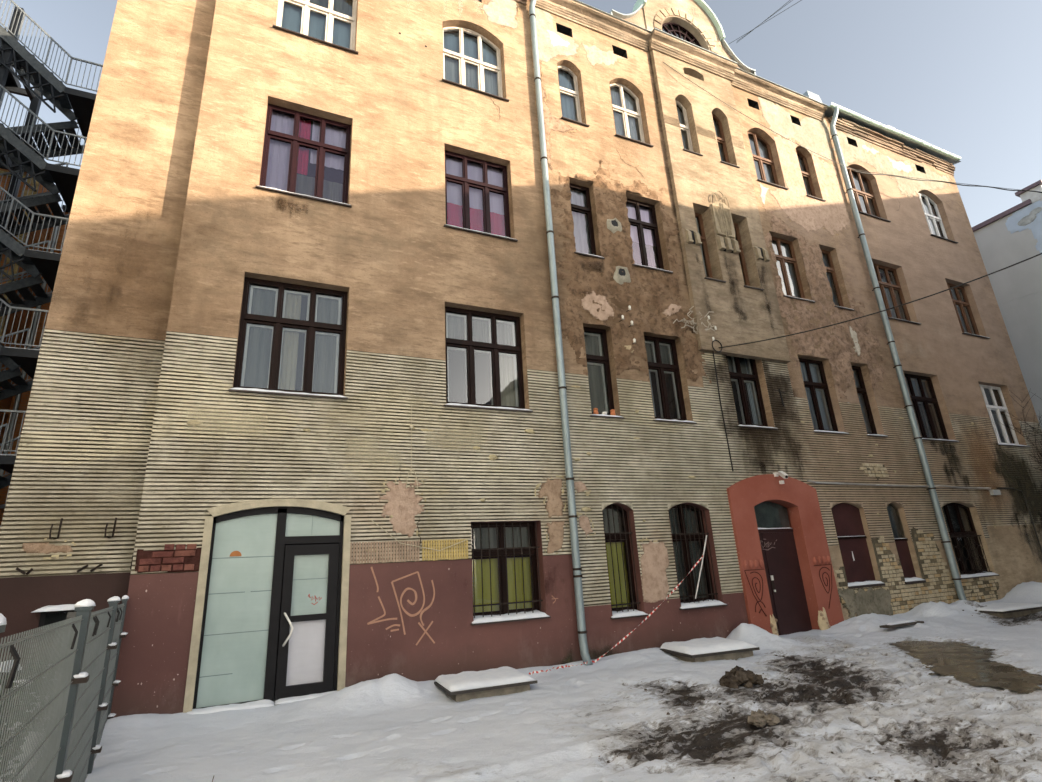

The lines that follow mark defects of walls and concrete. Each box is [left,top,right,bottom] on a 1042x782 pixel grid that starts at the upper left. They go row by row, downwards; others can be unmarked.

spalling [479,0,712,383]
spalling [758,96,951,399]
spalling [376,477,428,538]
spalling [535,476,596,554]
flaking render [859,463,889,480]
flaking render [135,544,202,574]
spalling [638,538,671,603]
flaking render [834,526,1000,615]